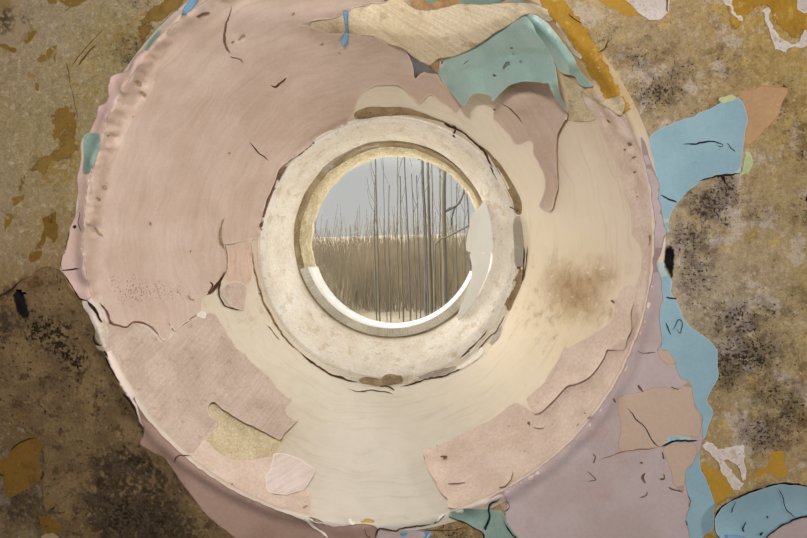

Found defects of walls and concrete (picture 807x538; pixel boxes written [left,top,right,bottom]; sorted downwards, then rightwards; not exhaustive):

peeling [599,0,670,20]
peeling [762,7,807,52]
peeling [797,0,807,13]
peeling [60,29,161,300]
peeling [83,0,593,495]
peeling [422,16,788,538]
leakage [664,246,675,277]
leakage [693,190,728,225]
leakage [0,290,87,381]
spalling [0,266,432,538]
leakage [85,446,194,538]
peeling [715,484,807,538]